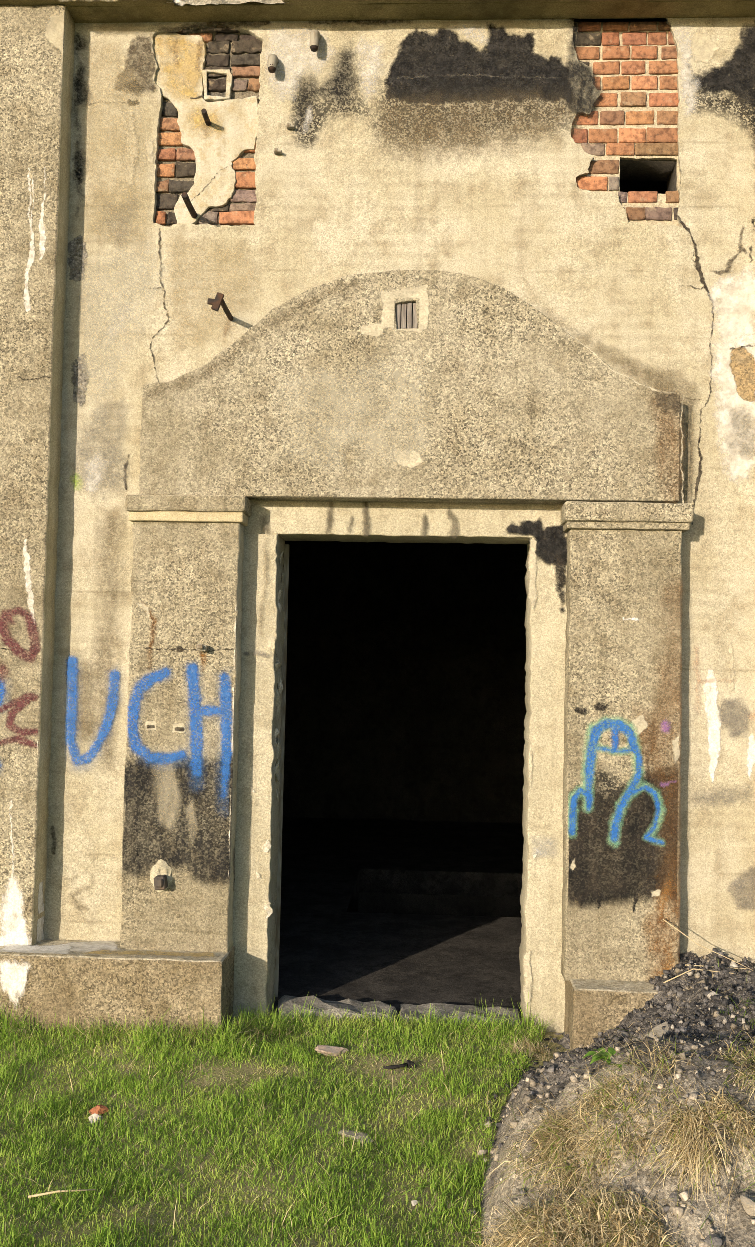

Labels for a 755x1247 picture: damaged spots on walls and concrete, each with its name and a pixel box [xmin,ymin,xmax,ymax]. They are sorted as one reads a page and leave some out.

flaking render [124,25,263,227]
leakage [358,44,568,139]
flaking render [571,22,680,227]
leakage [676,29,755,131]
crack [149,229,169,382]
crack [676,215,714,524]
leakage [554,558,566,612]
leakage [575,772,624,820]
corrosion [631,715,648,735]
corrosion [672,736,680,761]
efflorescence [0,800,117,1002]
corrosion [649,880,680,975]